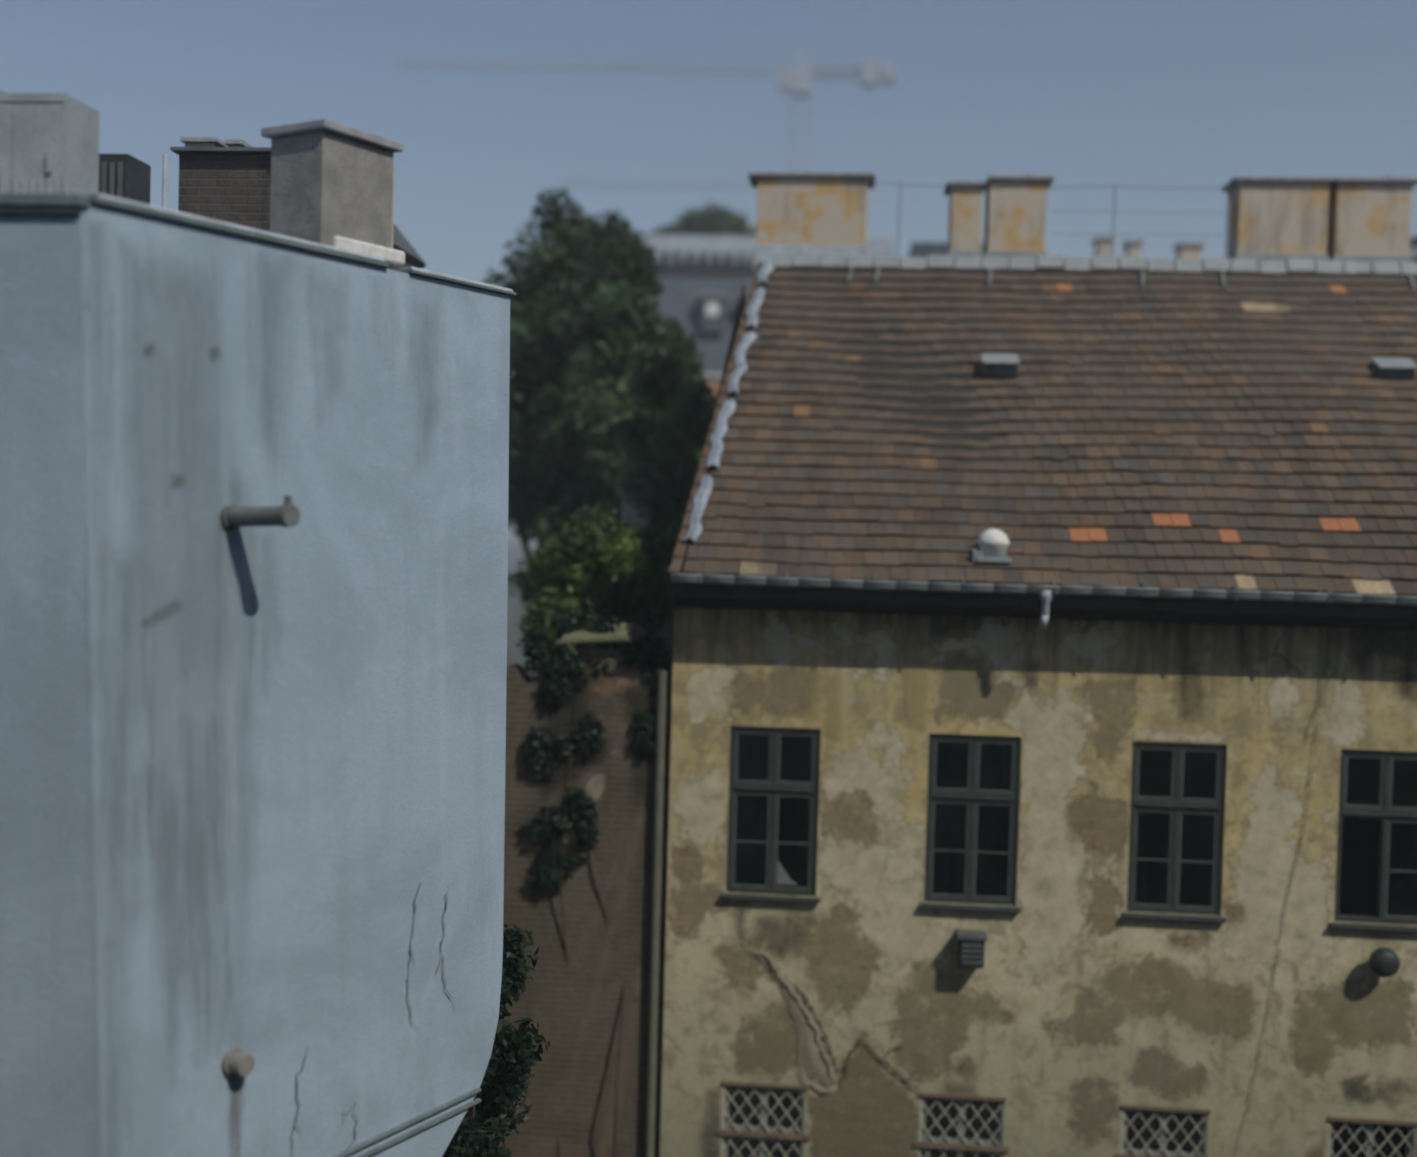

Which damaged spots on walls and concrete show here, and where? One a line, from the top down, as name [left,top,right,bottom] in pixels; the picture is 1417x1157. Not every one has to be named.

crack [407,881,456,1030]
peeling [669,762,730,943]
peeling [682,661,744,727]
peeling [820,713,958,1040]
peeling [826,620,1130,989]
flaking render [1043,953,1254,1045]
peeling [1127,727,1233,742]
peeling [1258,670,1304,729]
crack [1235,628,1329,1156]
peeling [1208,758,1417,1077]
peeling [1311,662,1372,750]
crack [291,1044,308,1157]